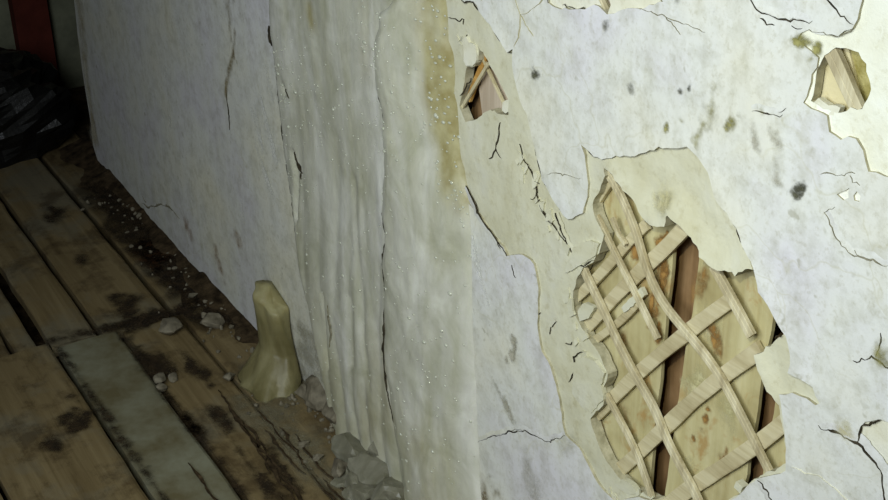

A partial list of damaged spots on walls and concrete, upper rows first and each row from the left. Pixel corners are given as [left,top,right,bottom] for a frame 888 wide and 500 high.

crack [750,0,853,37]
mould [792,36,820,55]
flaking render [801,0,888,176]
crack [489,122,594,267]
mould [792,184,805,200]
damp [40,187,235,387]
spalling [446,0,819,500]
damp [59,383,169,500]
damp [158,390,246,500]
damp [235,396,346,499]
crack [478,425,565,443]
crack [818,419,888,500]